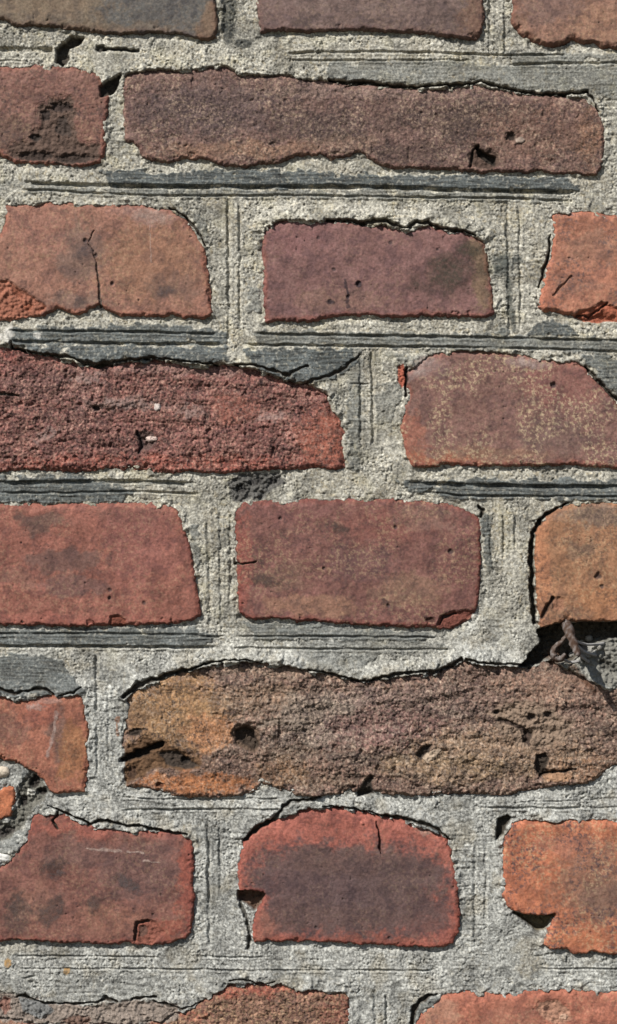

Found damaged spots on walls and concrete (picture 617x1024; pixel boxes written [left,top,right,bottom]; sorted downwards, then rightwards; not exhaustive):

crack [90,233,103,308]
crack [9,341,360,384]
spalling [119,728,205,788]
crack [51,806,188,836]
crack [243,796,451,853]